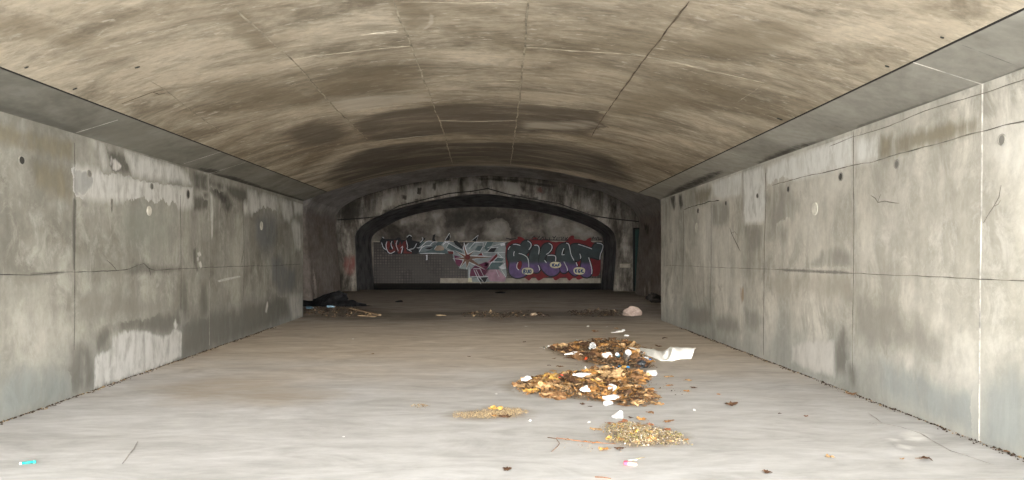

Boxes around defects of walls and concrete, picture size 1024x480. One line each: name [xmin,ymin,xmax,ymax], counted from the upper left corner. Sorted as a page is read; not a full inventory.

crack [764,79,1024,240]
crack [0,256,245,293]
leakage [0,103,303,397]